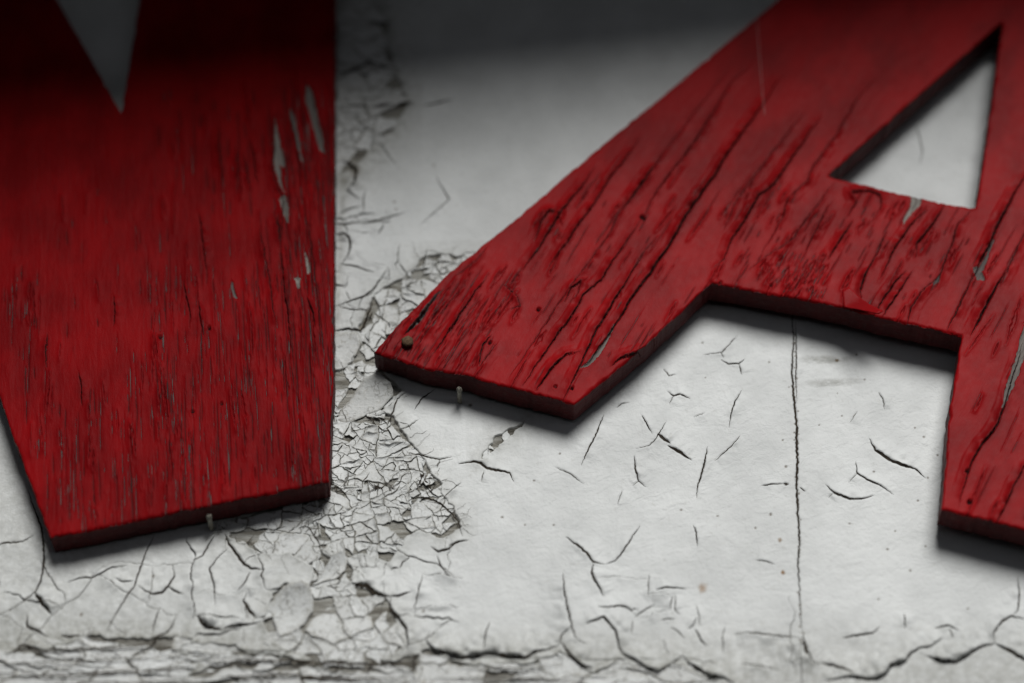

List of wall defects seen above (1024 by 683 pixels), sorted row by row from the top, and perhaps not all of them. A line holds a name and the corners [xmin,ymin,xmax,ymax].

crack [218,111,485,356]
crack [509,69,776,398]
peeling [0,246,739,683]
crack [0,315,1024,683]